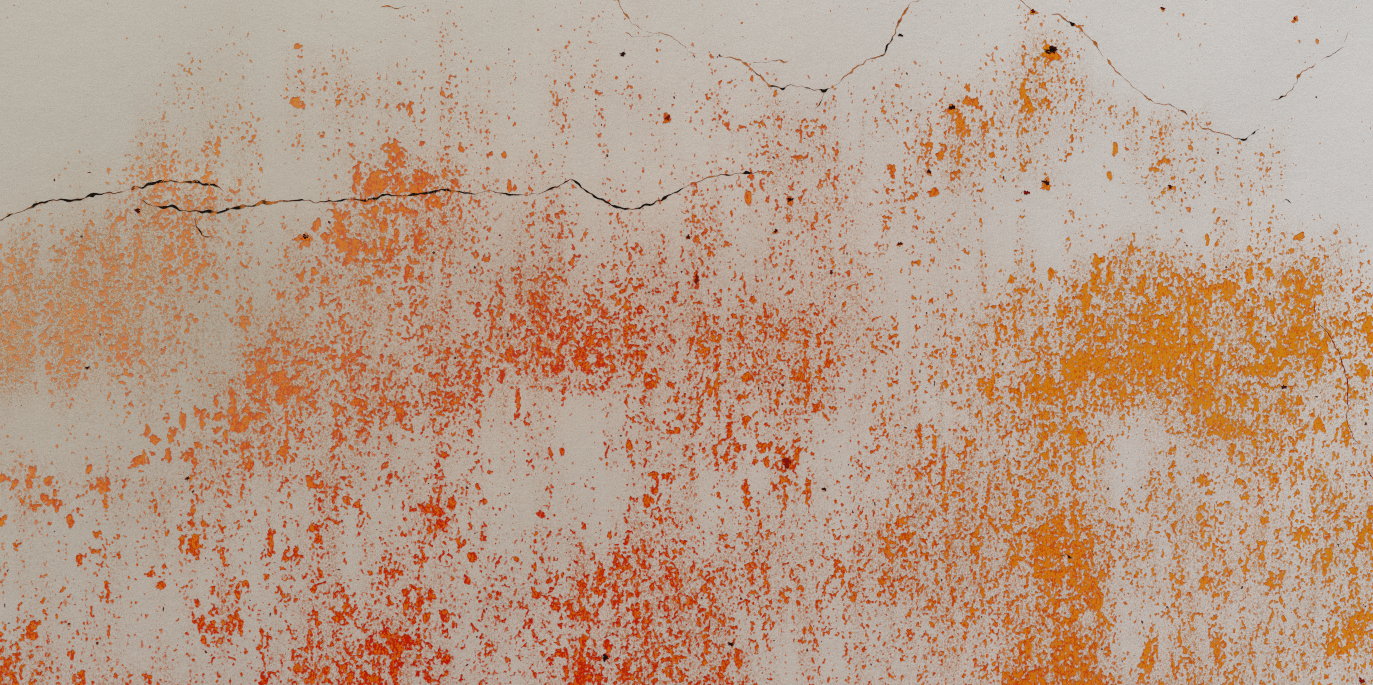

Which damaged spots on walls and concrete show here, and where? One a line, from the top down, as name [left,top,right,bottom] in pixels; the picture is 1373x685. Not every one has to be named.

crack [618,0,919,107]
crack [1021,0,1259,141]
crack [1273,37,1347,100]
peeling [128,164,266,234]
crack [1,171,762,242]
peeling [270,146,502,321]
peeling [0,346,306,581]